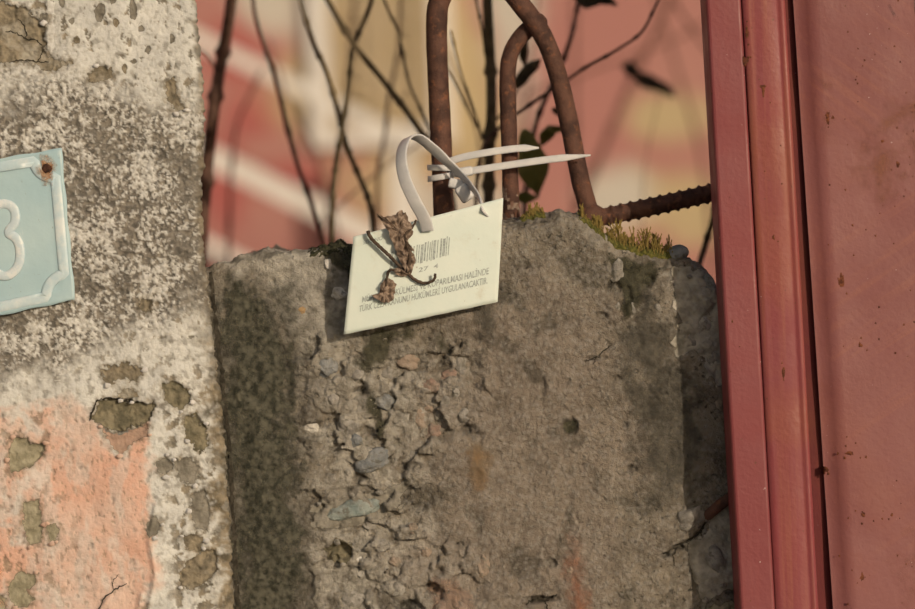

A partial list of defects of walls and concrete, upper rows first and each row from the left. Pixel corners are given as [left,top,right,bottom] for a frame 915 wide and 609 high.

crack [5,19,47,63]
spalling [0,0,73,71]
water stain [622,304,699,504]
spalling [4,435,49,473]
spalling [91,361,218,591]
water stain [219,274,307,609]
spalling [22,499,60,549]
spalling [0,570,39,609]
crack [98,577,127,609]